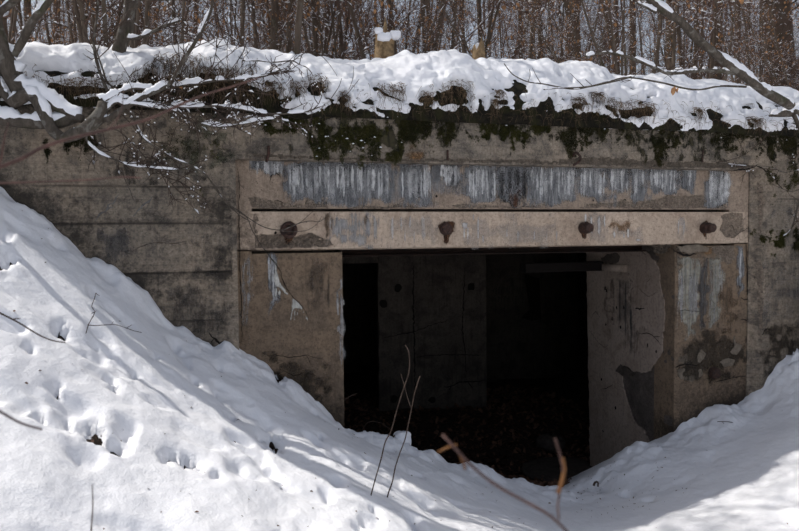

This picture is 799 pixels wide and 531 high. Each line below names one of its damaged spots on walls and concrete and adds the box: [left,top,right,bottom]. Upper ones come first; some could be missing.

leakage [107,118,234,185]
leakage [249,117,731,249]
spalling [253,153,750,169]
leakage [97,228,128,262]
flaking render [586,212,744,467]